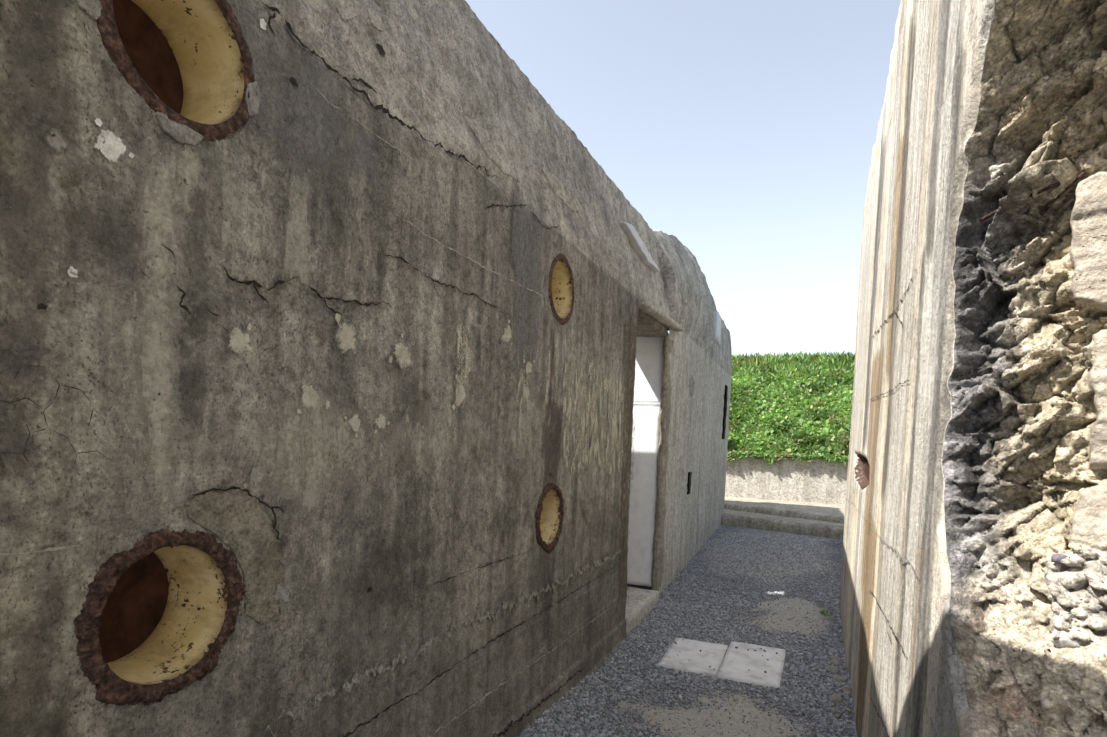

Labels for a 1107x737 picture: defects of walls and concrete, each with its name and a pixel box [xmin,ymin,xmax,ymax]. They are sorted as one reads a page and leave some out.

crack [260,0,498,178]
water stain [0,0,129,292]
water stain [216,139,239,251]
crack [485,204,558,230]
water stain [105,147,208,508]
crack [224,267,393,315]
crack [373,249,500,309]
crack [0,350,114,471]
water stain [263,394,361,502]
water stain [380,405,489,485]
crack [192,486,285,546]